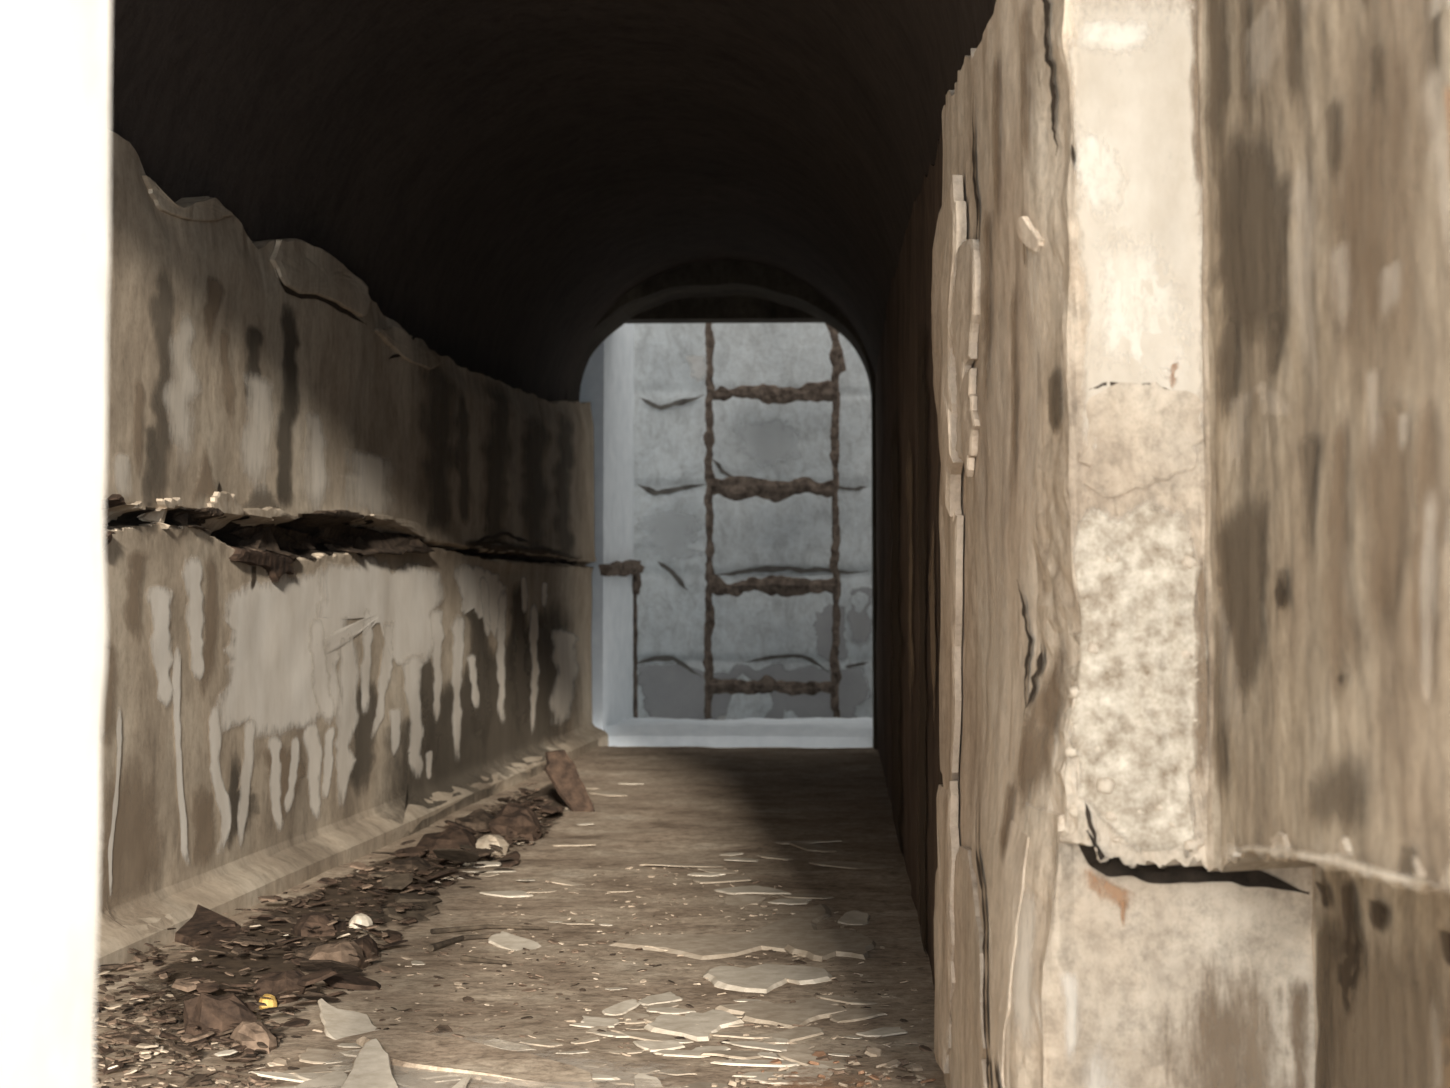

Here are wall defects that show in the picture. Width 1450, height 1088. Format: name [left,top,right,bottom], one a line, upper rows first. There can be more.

crack [1042,0,1081,175]
damp [115,274,329,508]
damp [101,645,158,918]
damp [126,553,578,862]
crack [949,806,1029,1088]
crack [1017,581,1043,718]
spalling [1064,501,1208,858]
crack [1078,801,1310,894]
spalling [1274,577,1285,610]
peeling [1333,836,1354,860]
damp [1292,882,1450,1088]
peeling [1410,856,1426,879]